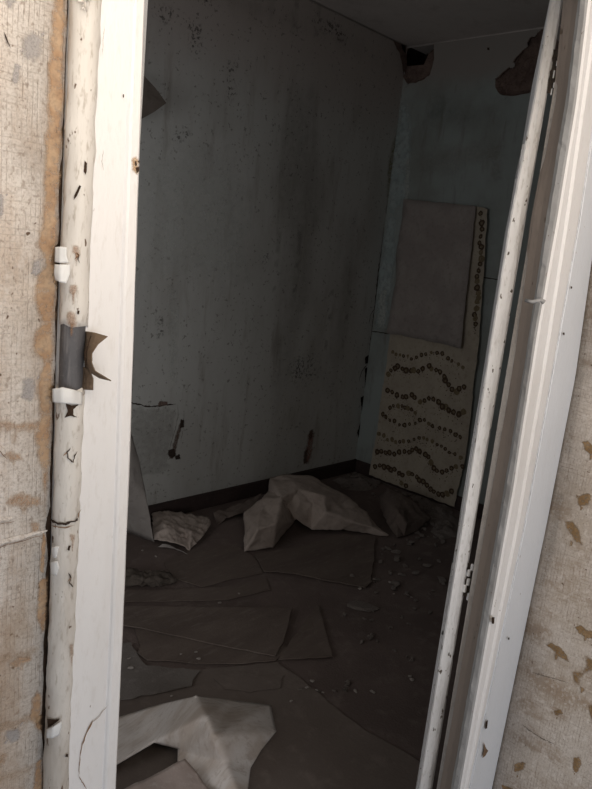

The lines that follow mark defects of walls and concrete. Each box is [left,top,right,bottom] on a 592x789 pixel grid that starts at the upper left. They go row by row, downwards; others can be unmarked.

spalling [394,41,434,88]
spalling [492,28,544,100]
crack [36,0,81,775]
crack [79,708,106,788]